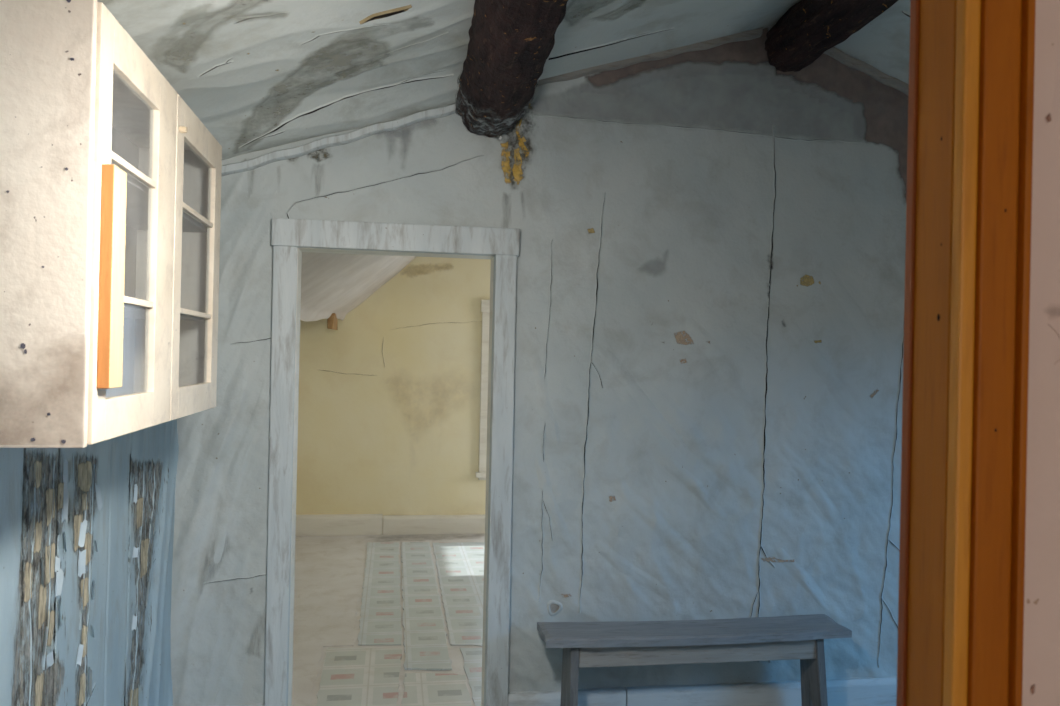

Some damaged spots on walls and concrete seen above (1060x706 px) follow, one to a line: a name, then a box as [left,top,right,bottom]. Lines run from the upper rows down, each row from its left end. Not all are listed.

peeling [586,28,908,199]
crack [539,421,547,462]
crack [538,490,553,602]
crack [544,239,553,378]
crack [578,192,606,613]
crack [749,125,776,618]
crack [877,291,905,668]